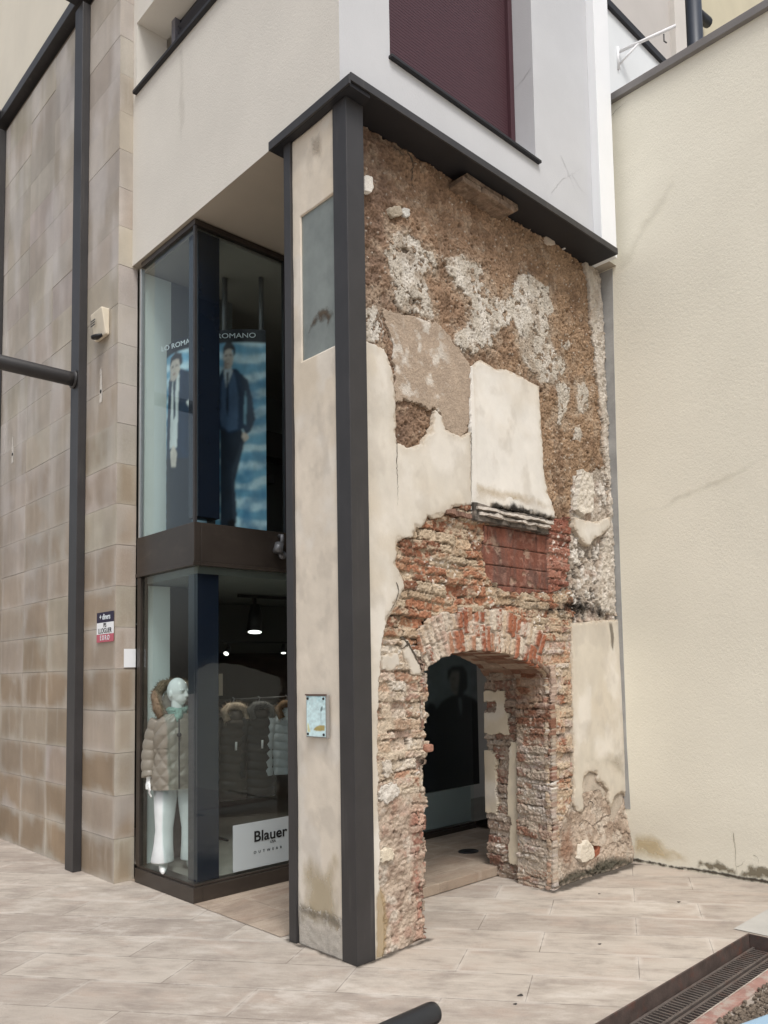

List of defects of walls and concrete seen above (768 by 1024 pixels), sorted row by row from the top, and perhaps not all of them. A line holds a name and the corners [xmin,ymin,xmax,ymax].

spalling [363,126,606,564]
spalling [383,505,576,650]
spalling [558,772,634,886]